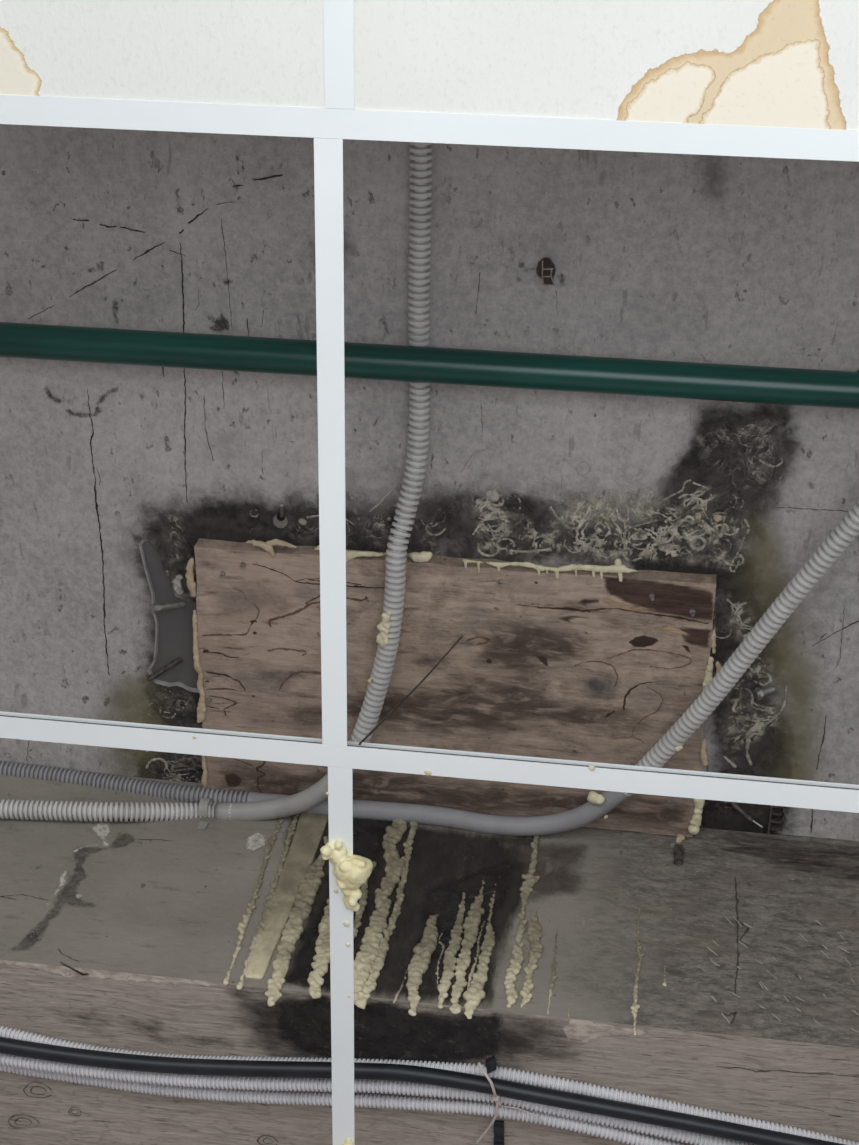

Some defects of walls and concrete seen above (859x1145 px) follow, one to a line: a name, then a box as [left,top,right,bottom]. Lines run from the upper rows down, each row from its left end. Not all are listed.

water stain [617,0,846,130]
crack [162,367,225,502]
crack [87,390,110,676]
water stain [134,495,320,604]
water stain [346,405,797,674]
crack [813,606,859,667]
water stain [116,655,203,729]
water stain [380,684,611,732]
water stain [715,623,806,780]
water stain [121,748,203,783]
water stain [353,773,588,809]
water stain [701,800,786,834]